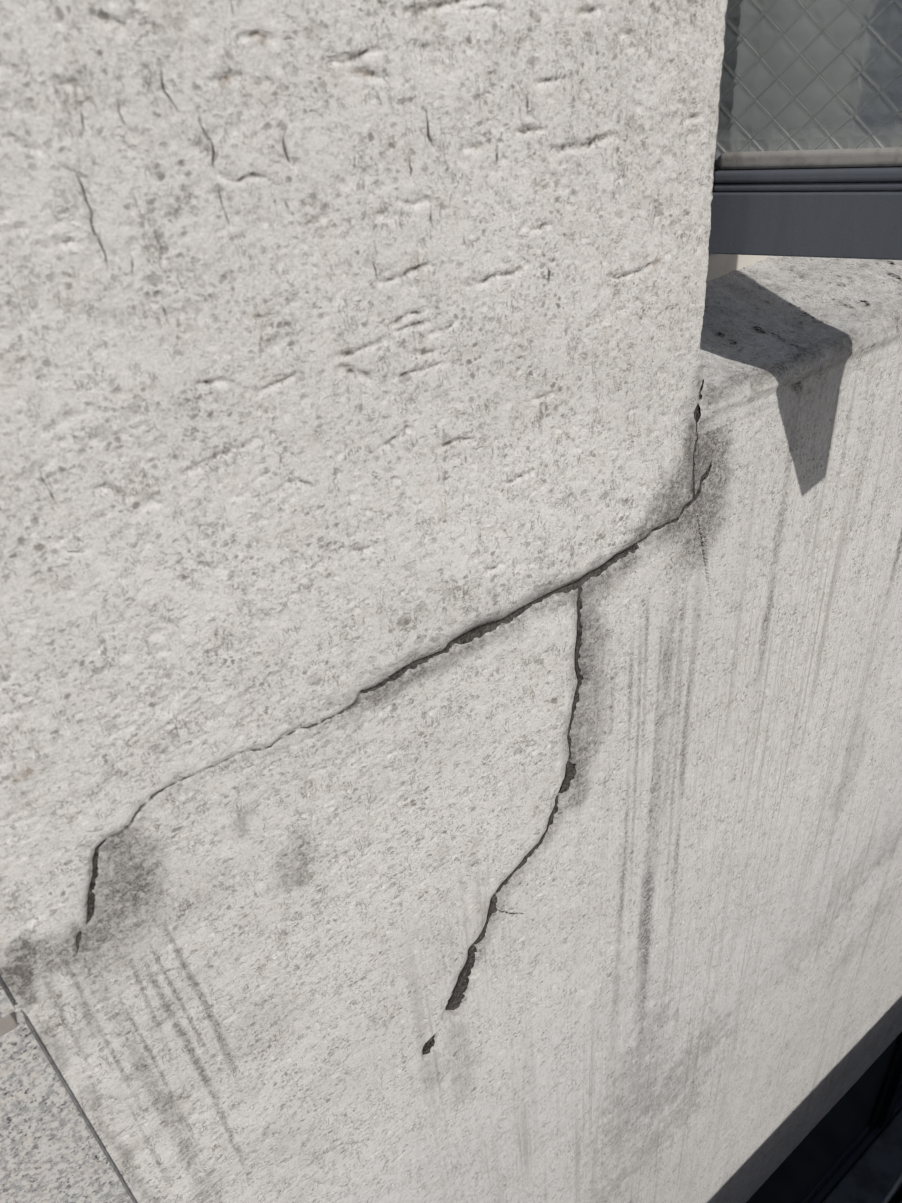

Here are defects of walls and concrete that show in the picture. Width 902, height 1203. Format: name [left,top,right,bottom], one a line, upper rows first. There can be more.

crack [76,379,712,954]
water stain [136,974,208,1083]